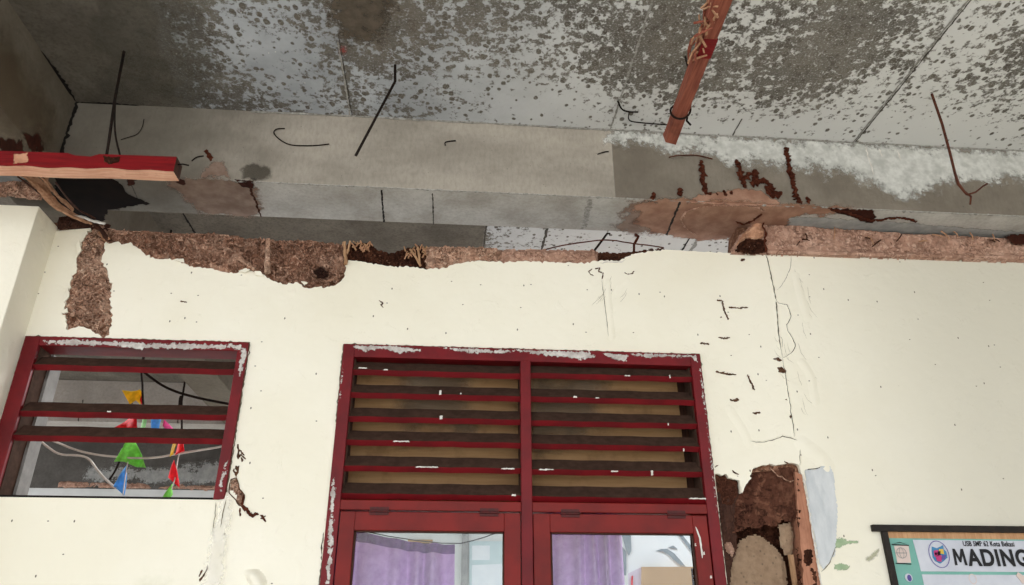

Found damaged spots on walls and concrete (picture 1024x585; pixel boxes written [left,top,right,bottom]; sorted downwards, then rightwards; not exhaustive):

damp [327,0,400,45]
damp [0,52,54,152]
damp [243,164,270,181]
efflorescence [603,131,1024,201]
peeling [767,225,1024,263]
spalling [43,224,665,376]
peeling [439,347,707,415]
crack [751,255,817,465]
spalling [689,433,838,585]